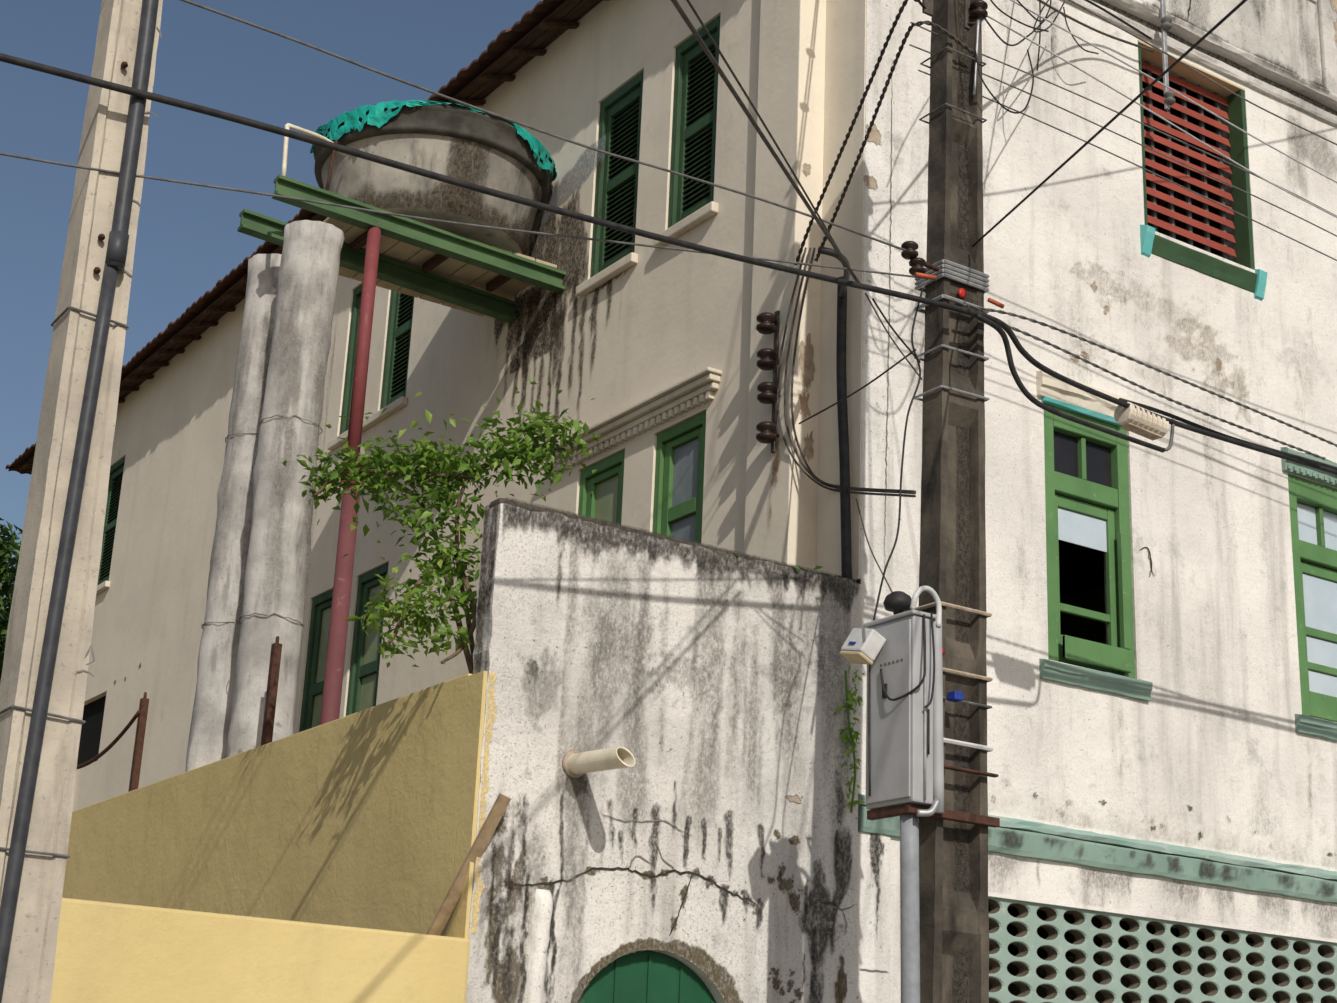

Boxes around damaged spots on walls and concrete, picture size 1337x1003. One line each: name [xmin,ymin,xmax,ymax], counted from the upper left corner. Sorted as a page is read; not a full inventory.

leakage [1093,0,1337,116]
spalling [1329,0,1337,46]
leakage [351,138,617,422]
peeling [797,332,816,462]
leakage [473,498,859,744]
leakage [481,768,588,1003]
crack [500,814,763,936]
leakage [609,741,733,889]
leakage [758,772,852,1003]
leakage [870,833,884,930]
leakage [571,937,743,1003]